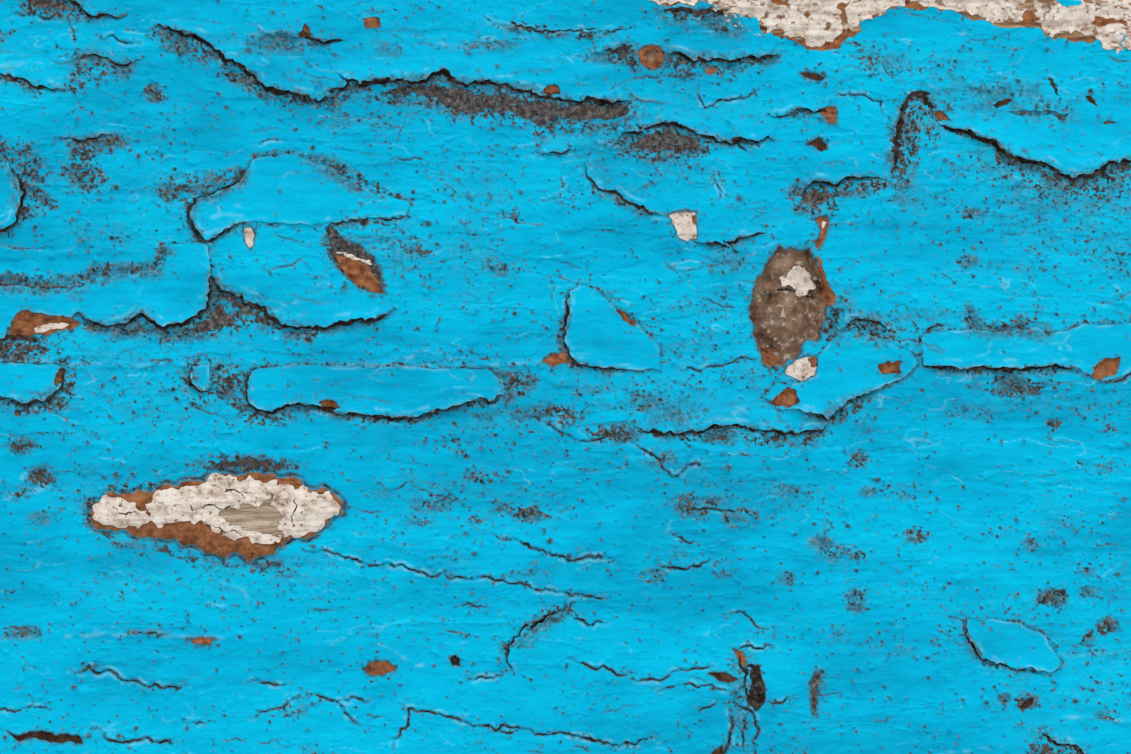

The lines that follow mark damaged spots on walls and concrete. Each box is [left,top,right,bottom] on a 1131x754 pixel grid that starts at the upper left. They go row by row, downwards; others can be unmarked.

peeling [146,0,1131,248]
peeling [0,154,411,405]
peeling [780,266,816,297]
peeling [634,302,1131,437]
peeling [90,472,343,561]
peeling [711,650,766,711]
crack [397,708,652,746]